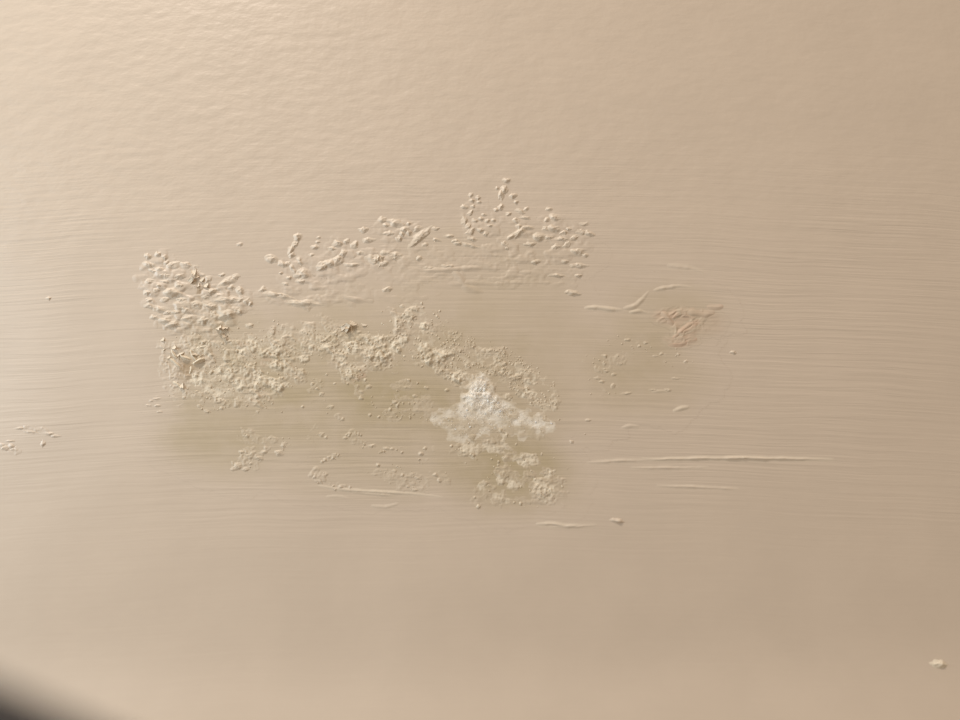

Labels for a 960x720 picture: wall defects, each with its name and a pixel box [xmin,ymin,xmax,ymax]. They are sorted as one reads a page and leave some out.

peeling [156,337,206,400]
damp [123,208,747,533]
spalling [448,427,570,514]